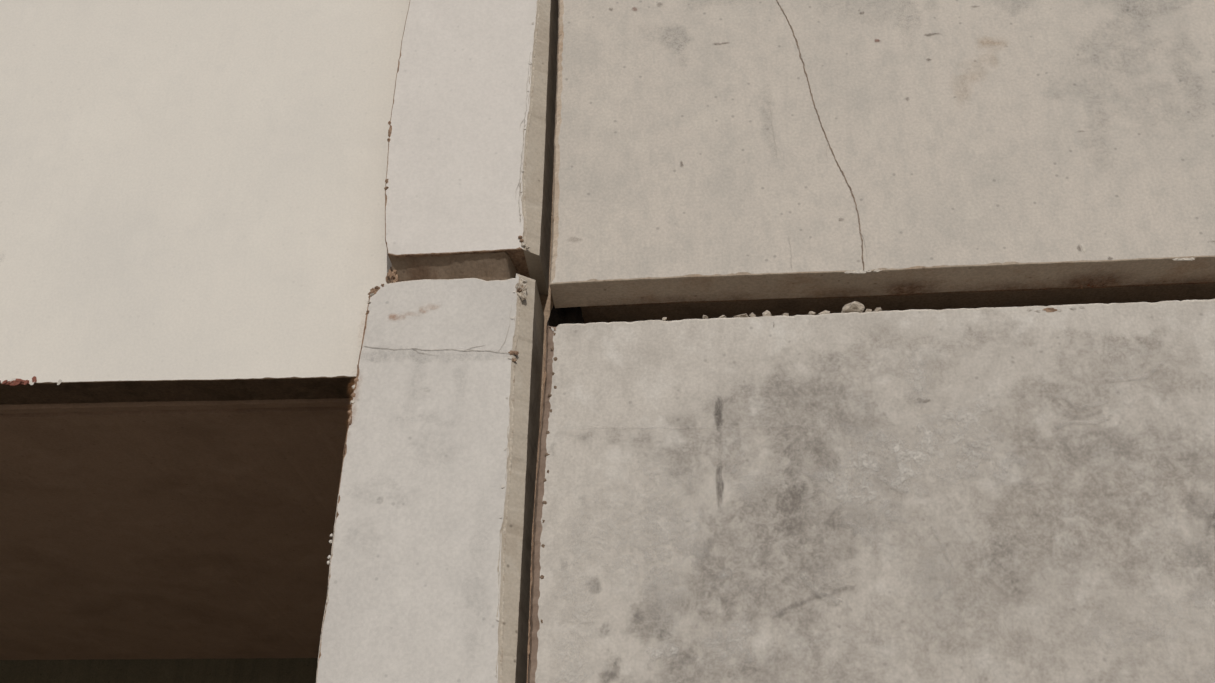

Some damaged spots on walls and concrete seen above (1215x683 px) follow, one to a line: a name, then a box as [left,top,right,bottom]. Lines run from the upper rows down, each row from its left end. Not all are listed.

crack [776,0,867,270]
damp [819,403,989,519]